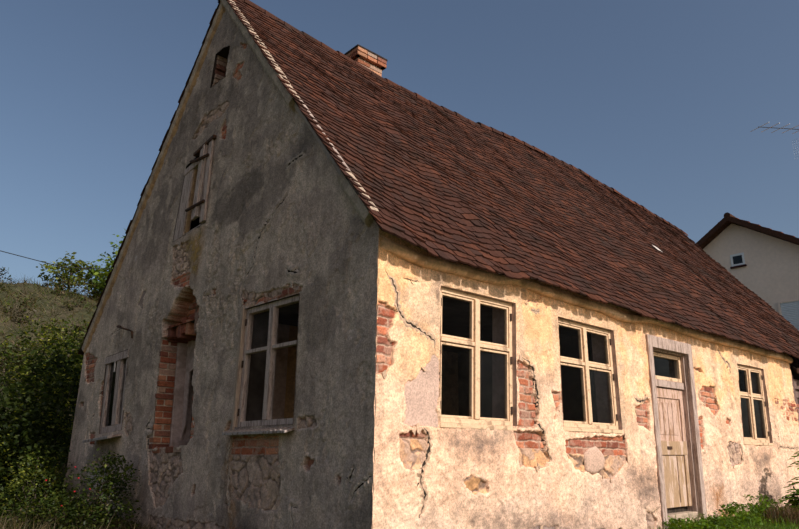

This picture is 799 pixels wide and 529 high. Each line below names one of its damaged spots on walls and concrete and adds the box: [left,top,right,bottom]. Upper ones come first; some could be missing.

flaking render [376,302,395,379]
crack [385,270,436,348]
flaking render [84,353,104,416]
flaking render [513,354,549,472]
flaking render [635,400,648,429]
flaking render [698,386,719,414]
crack [417,425,433,518]
flaking render [565,433,631,483]
flaking render [646,511,658,529]